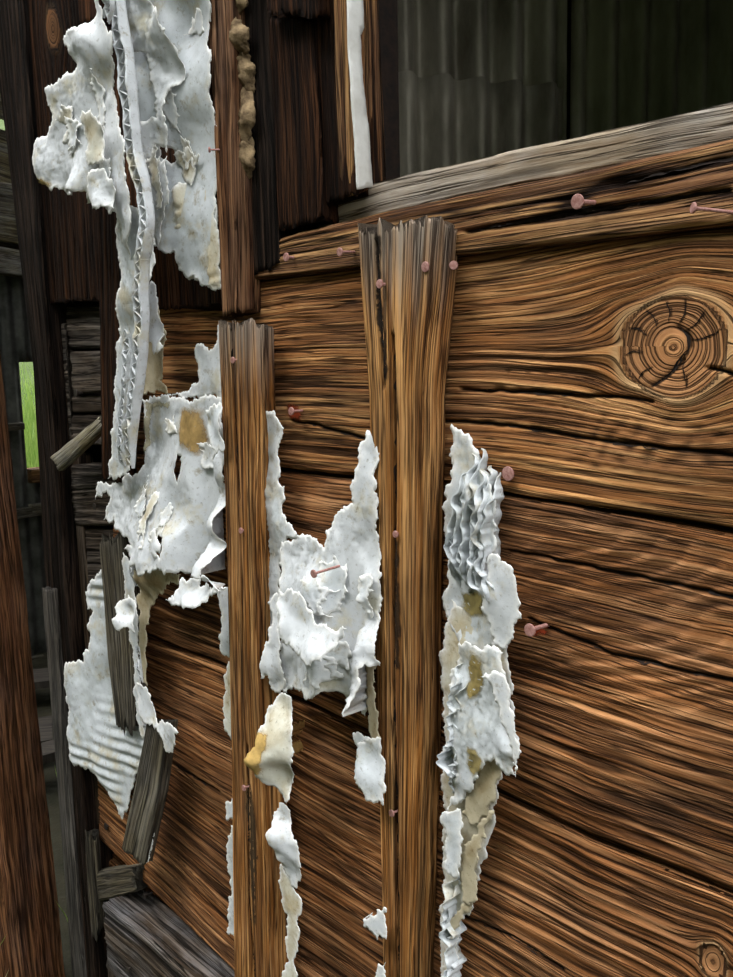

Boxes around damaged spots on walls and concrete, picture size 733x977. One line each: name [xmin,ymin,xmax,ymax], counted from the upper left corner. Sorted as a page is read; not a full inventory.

peeling [346,0,373,190]
crack [472,302,720,403]
crack [445,420,733,456]